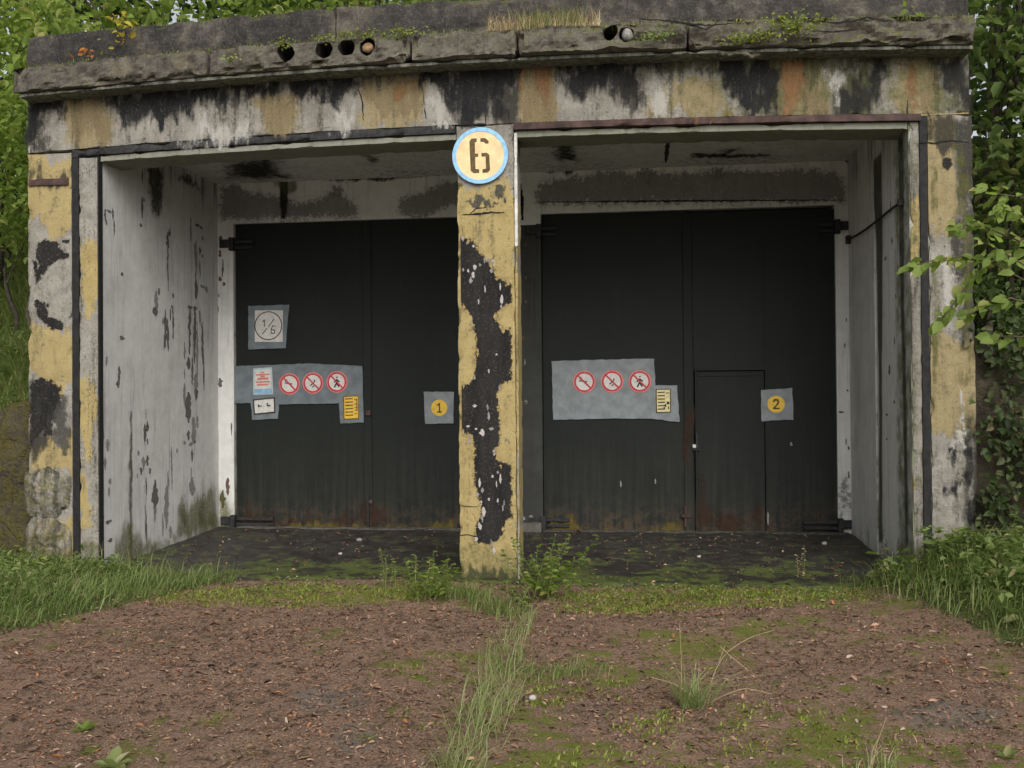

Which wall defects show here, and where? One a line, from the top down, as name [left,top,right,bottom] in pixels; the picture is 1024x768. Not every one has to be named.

leakage [109,78,362,149]
leakage [419,69,513,129]
leakage [555,63,668,117]
leakage [719,60,783,116]
rust [781,58,829,115]
leakage [823,58,887,124]
peeling [31,238,70,284]
peeling [34,299,64,331]
peeling [30,377,62,443]
peeling [137,218,226,540]
peeling [460,235,532,554]
leakage [943,392,975,526]